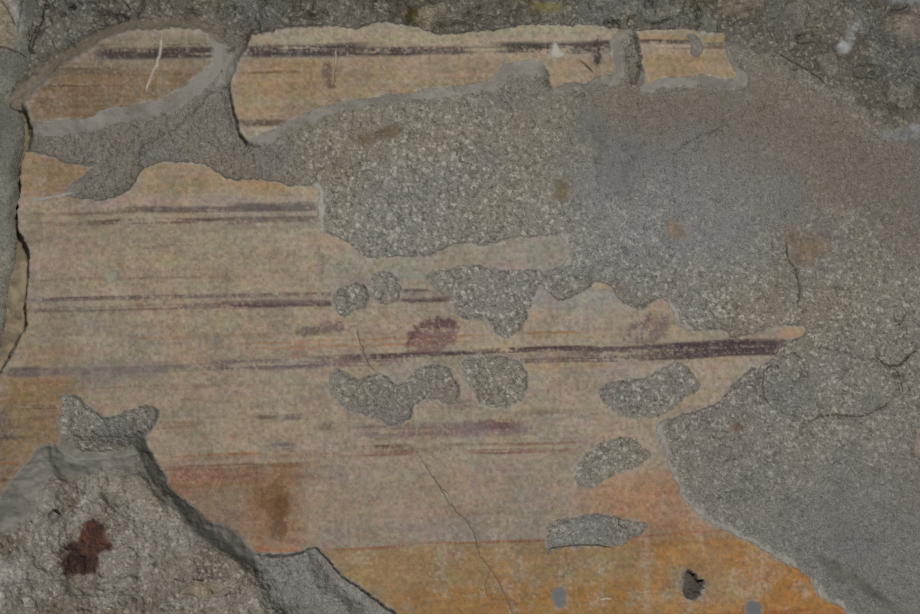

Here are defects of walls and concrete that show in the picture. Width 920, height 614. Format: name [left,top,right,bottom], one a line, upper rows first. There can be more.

flaking render [26,32,271,201]
flaking render [248,29,920,614]
spalling [0,394,396,614]
crack [417,453,513,614]